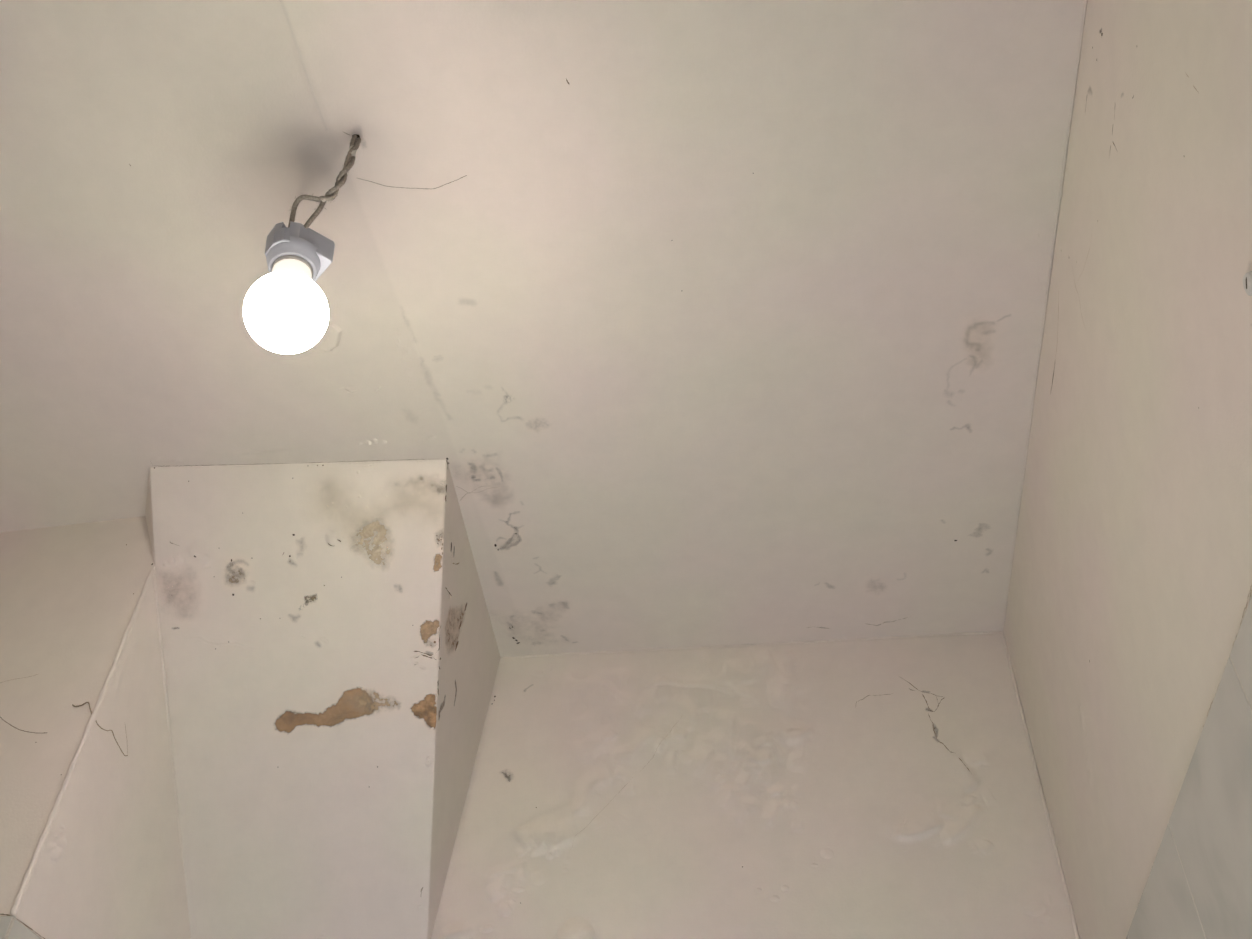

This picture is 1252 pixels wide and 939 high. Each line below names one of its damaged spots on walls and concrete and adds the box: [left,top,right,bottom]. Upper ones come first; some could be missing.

peeling [410,651,441,684]
crack [856,677,969,770]